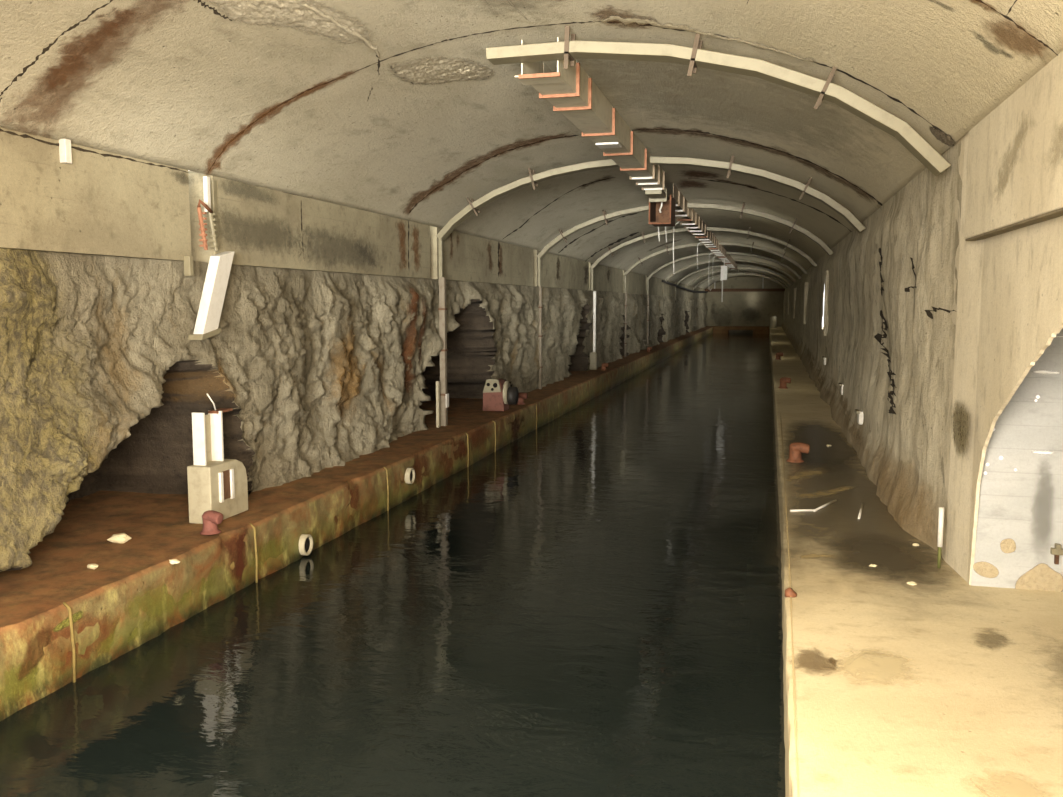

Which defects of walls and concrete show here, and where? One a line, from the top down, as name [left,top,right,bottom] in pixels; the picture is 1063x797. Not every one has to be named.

crack [0,0,113,102]
rust [206,71,352,175]
crack [241,21,729,132]
crack [814,62,947,135]
crack [0,129,218,173]
rust [398,134,567,267]
rust [414,455,429,487]
spalling [107,533,131,544]
rust [224,529,247,578]
peeling [973,562,999,578]
peeling [1000,539,1016,553]
peeling [1015,563,1063,592]